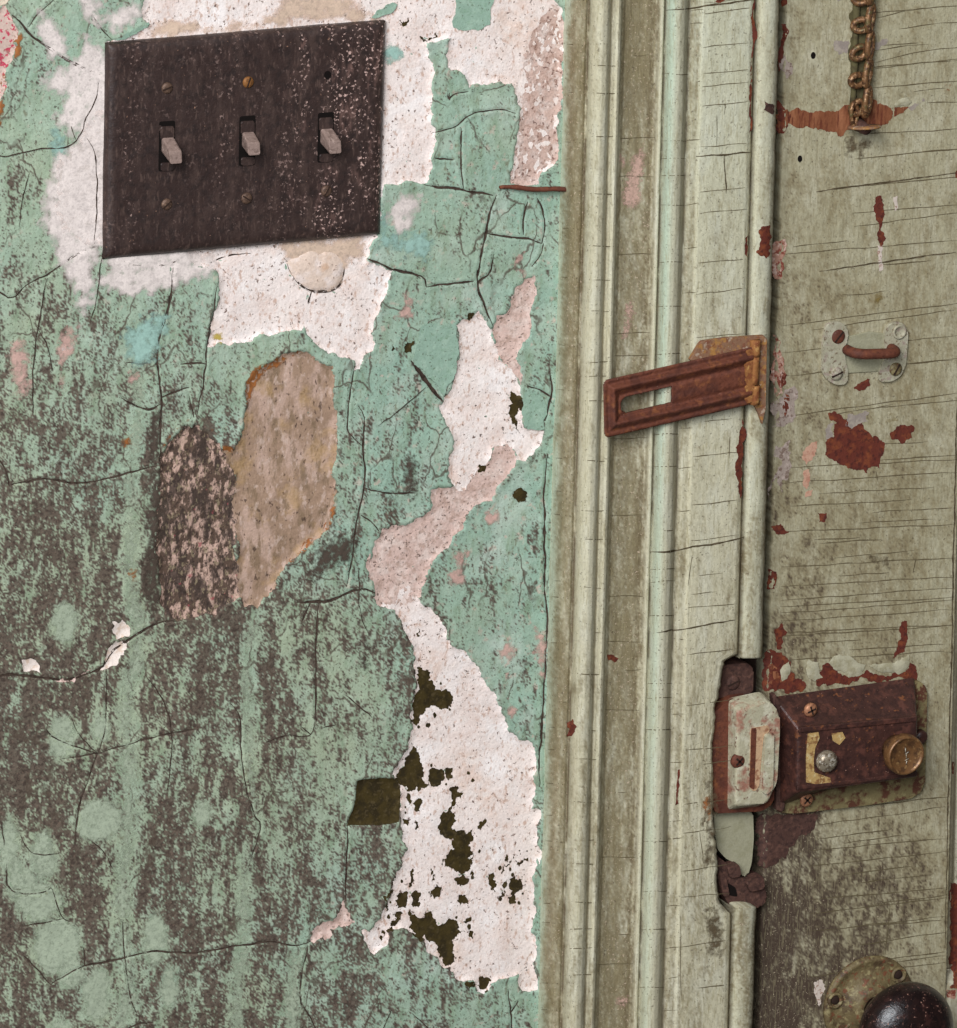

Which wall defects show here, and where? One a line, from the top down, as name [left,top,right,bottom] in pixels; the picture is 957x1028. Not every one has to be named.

crack [0,253,251,485]
peeling [36,0,564,622]
crack [284,91,750,326]
peeling [749,0,758,133]
peeling [764,97,925,137]
crack [267,361,443,742]
peeling [310,255,547,994]
crack [538,433,743,817]
rust [749,725,770,791]
crack [781,393,957,967]
crack [24,922,316,1028]
peeling [946,883,957,999]